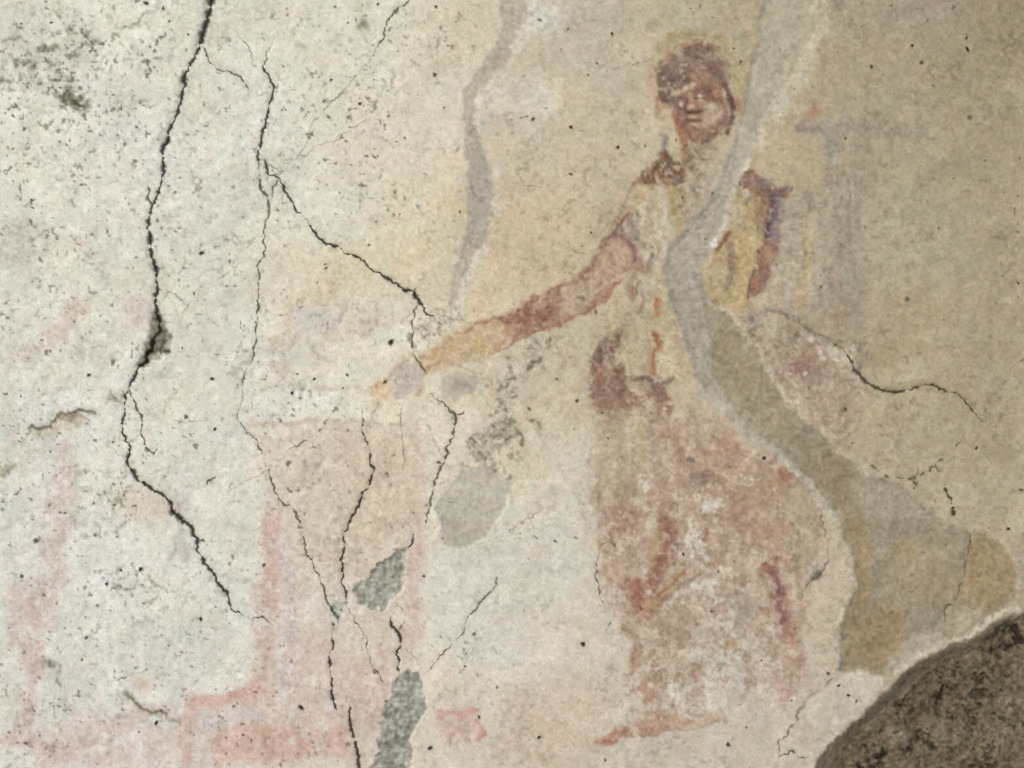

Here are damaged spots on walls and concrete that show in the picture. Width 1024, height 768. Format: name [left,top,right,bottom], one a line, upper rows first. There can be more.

crack [120,0,502,768]
crack [777,312,984,623]
spalling [806,602,1024,768]